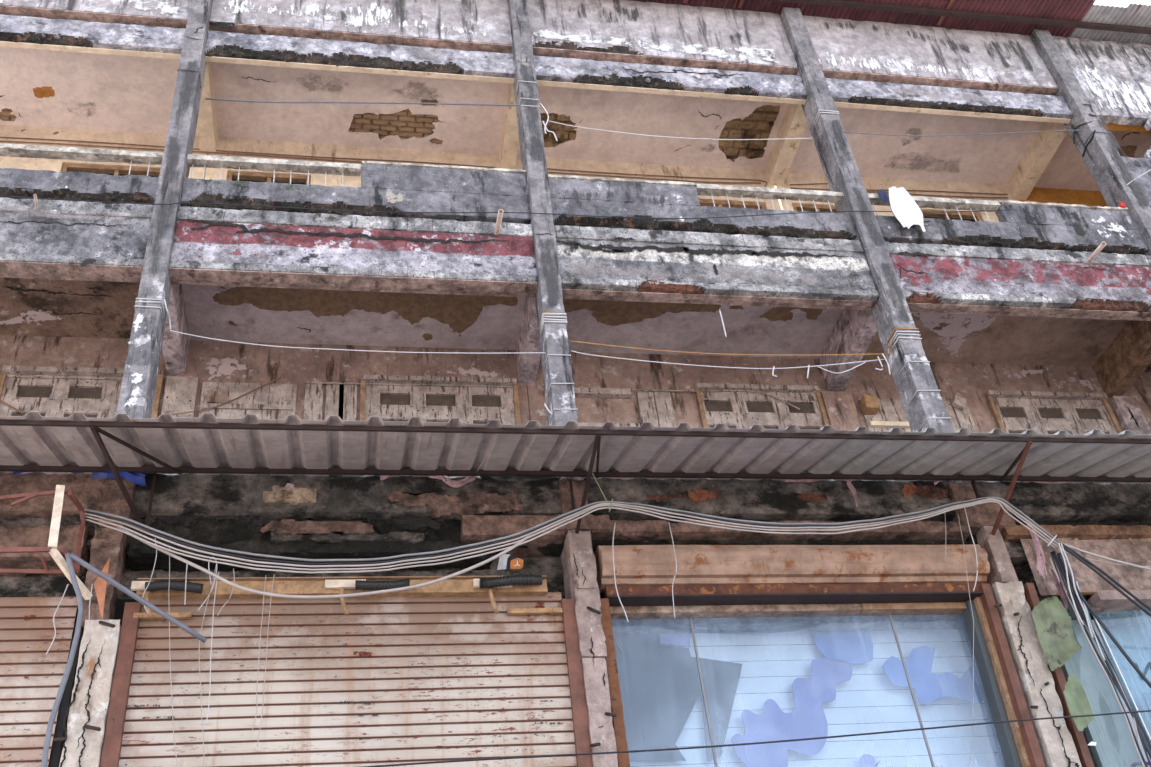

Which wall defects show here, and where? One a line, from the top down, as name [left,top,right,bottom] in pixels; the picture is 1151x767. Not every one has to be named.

spalling [0,31,93,48]
damp [133,0,180,15]
spalling [206,44,464,75]
damp [220,0,492,37]
spalling [348,98,444,147]
spalling [718,85,780,162]
spalling [848,95,1046,117]
crack [186,216,848,275]
peeling [210,286,518,340]
damp [1009,497,1053,507]
crack [58,639,106,767]
crack [1017,616,1080,767]